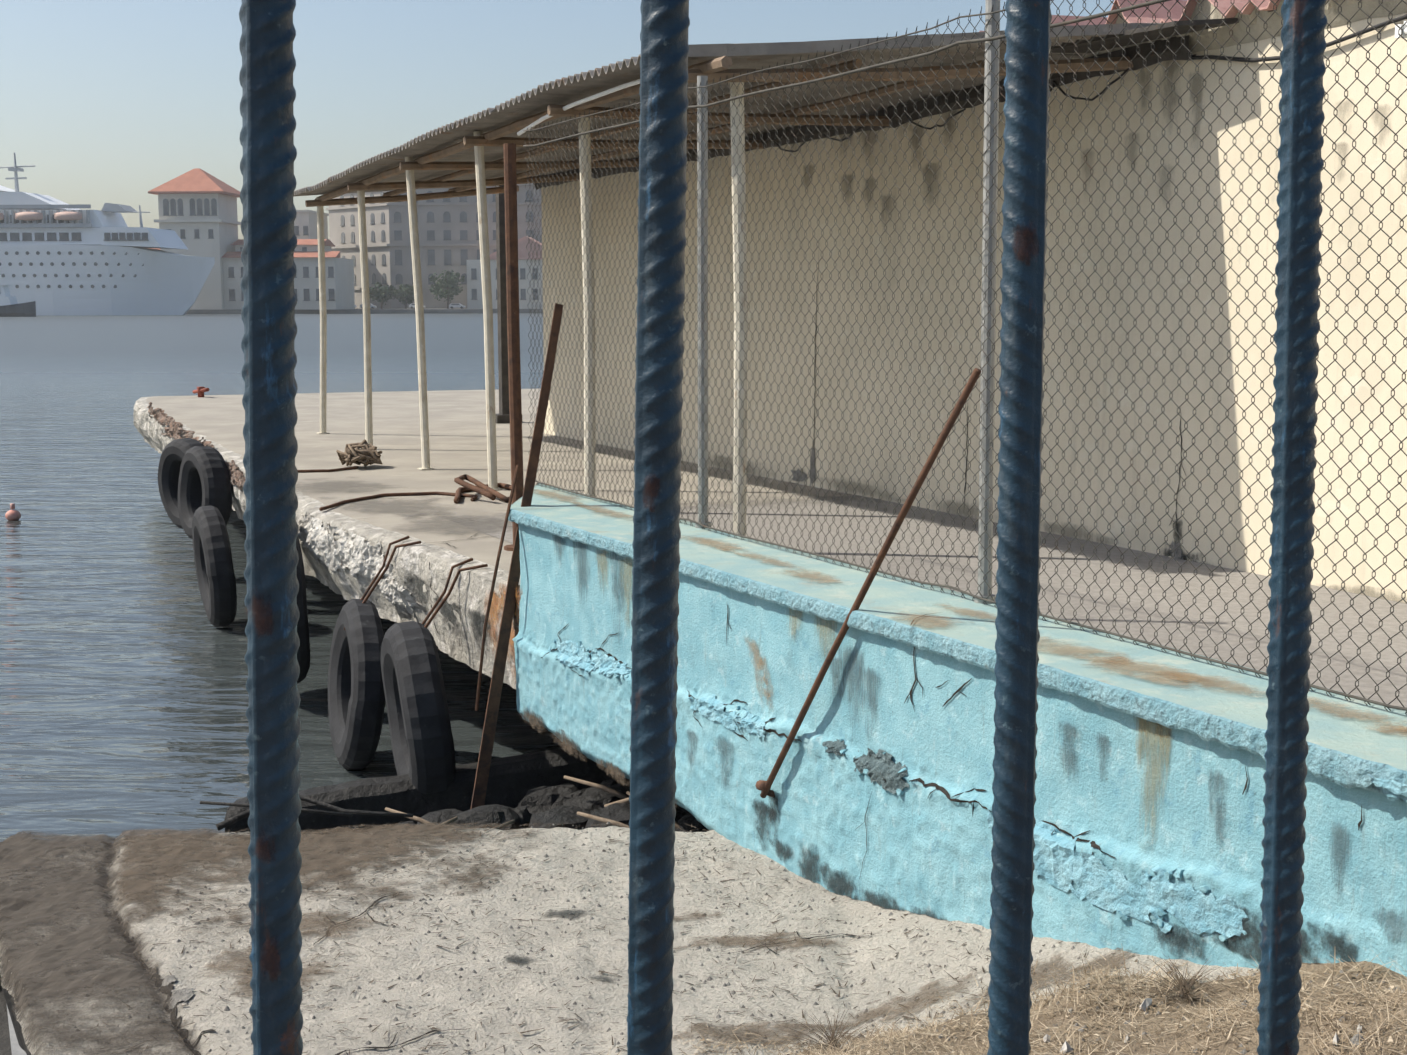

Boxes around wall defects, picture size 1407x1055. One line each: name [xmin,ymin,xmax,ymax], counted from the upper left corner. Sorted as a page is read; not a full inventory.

spalling [298,513,427,619]
spalling [548,638,631,679]
crack [904,612,972,712]
water stain [753,796,944,920]
spalling [822,739,909,796]
crack [909,778,992,816]
crack [1043,821,1115,858]
spalling [1033,819,1248,941]